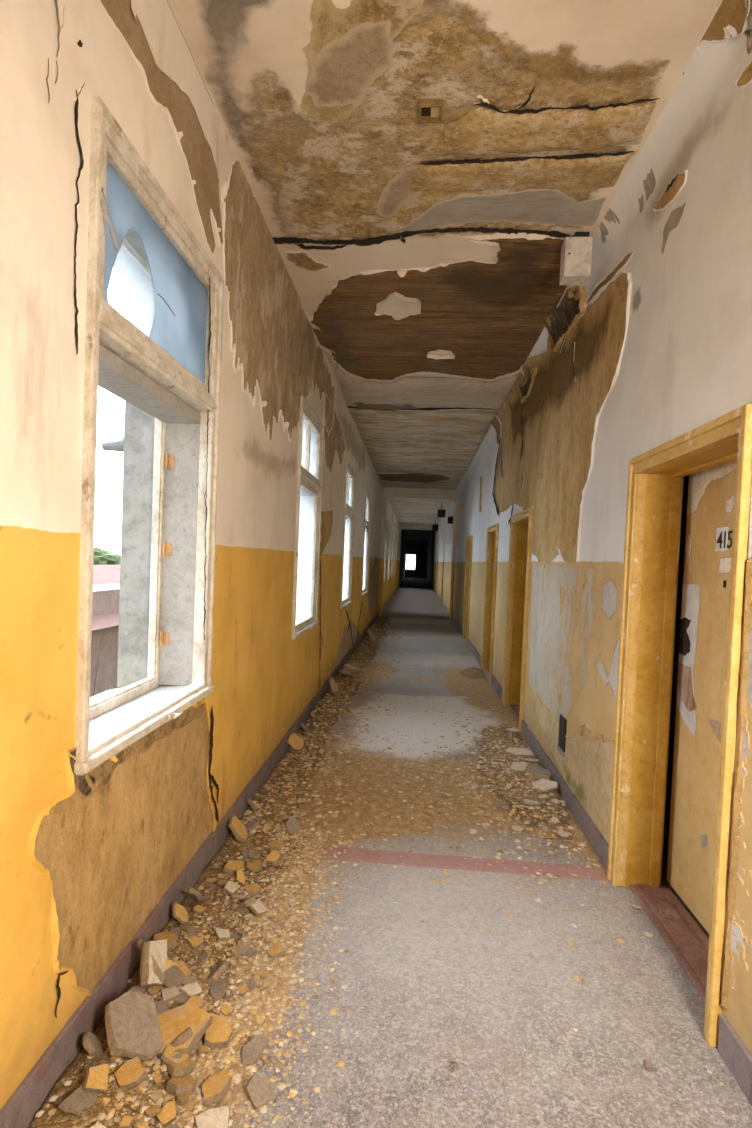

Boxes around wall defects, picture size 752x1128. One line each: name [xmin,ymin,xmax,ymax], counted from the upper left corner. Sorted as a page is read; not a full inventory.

crack [46,0,85,355]
crack [272,227,574,250]
leakage [205,0,654,241]
crack [418,149,634,165]
crack [473,85,660,114]
peeling [682,0,752,90]
crack [203,278,211,640]
spalling [99,0,640,844]
spalling [27,698,216,997]
crack [203,698,219,822]
spalling [678,617,691,655]
spalling [718,448,752,1011]